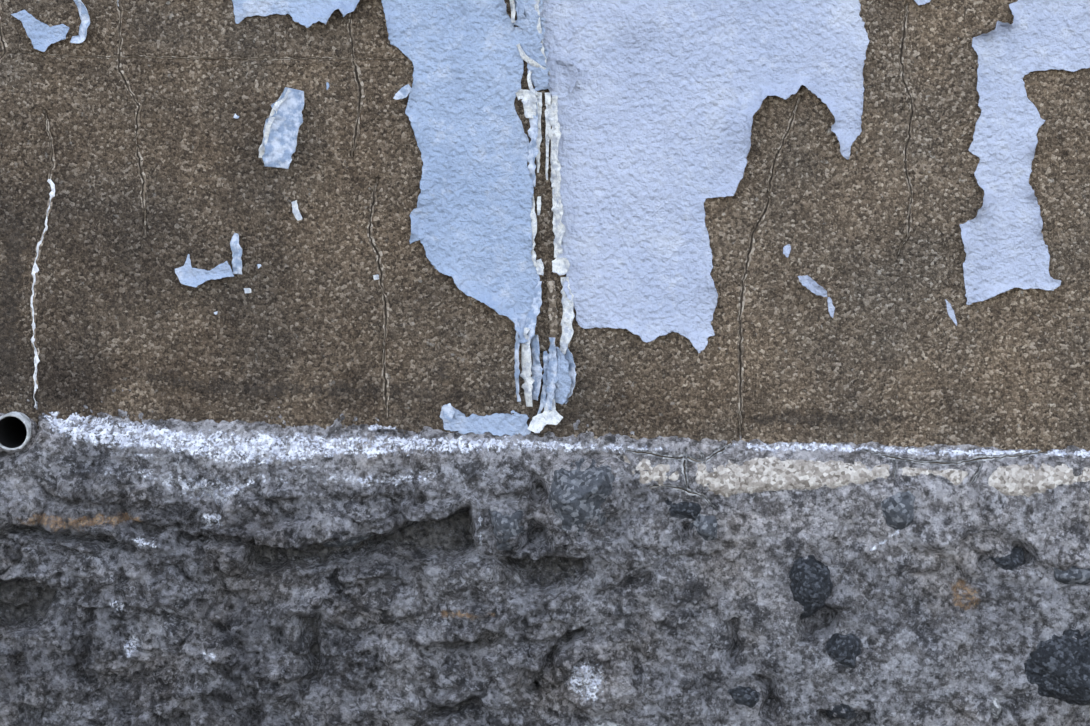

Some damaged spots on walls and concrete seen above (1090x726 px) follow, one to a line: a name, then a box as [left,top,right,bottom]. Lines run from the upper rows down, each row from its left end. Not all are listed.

crack [30,110,56,409]
peeling [11,0,90,52]
crack [0,0,399,237]
peeling [175,233,242,287]
peeling [258,87,304,169]
peeling [232,0,360,28]
crack [367,178,390,418]
peeling [381,0,540,343]
peeling [440,403,531,436]
peeling [540,0,869,353]
crack [626,97,801,509]
peeling [960,0,1090,305]